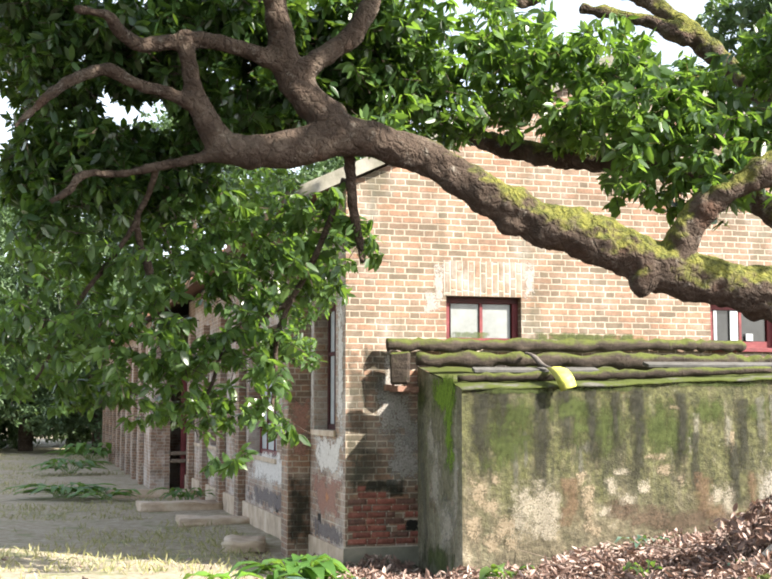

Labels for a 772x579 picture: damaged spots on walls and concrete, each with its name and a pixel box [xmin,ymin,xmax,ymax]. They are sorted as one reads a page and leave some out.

damp [471,389,509,478]
damp [512,388,550,490]
damp [577,387,601,473]
damp [630,389,645,477]
damp [676,392,700,485]